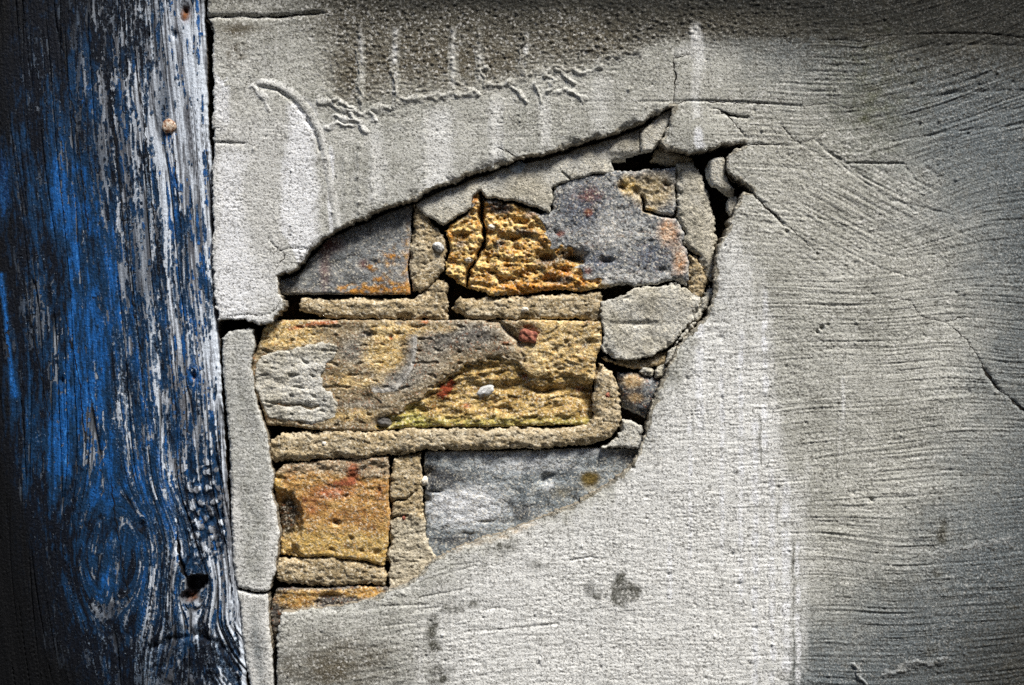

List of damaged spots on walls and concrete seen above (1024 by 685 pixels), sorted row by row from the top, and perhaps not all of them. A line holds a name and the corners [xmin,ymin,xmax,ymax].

crack [672,54,854,146]
crack [744,186,813,248]
spalling [334,103,757,522]
crack [868,291,1024,410]